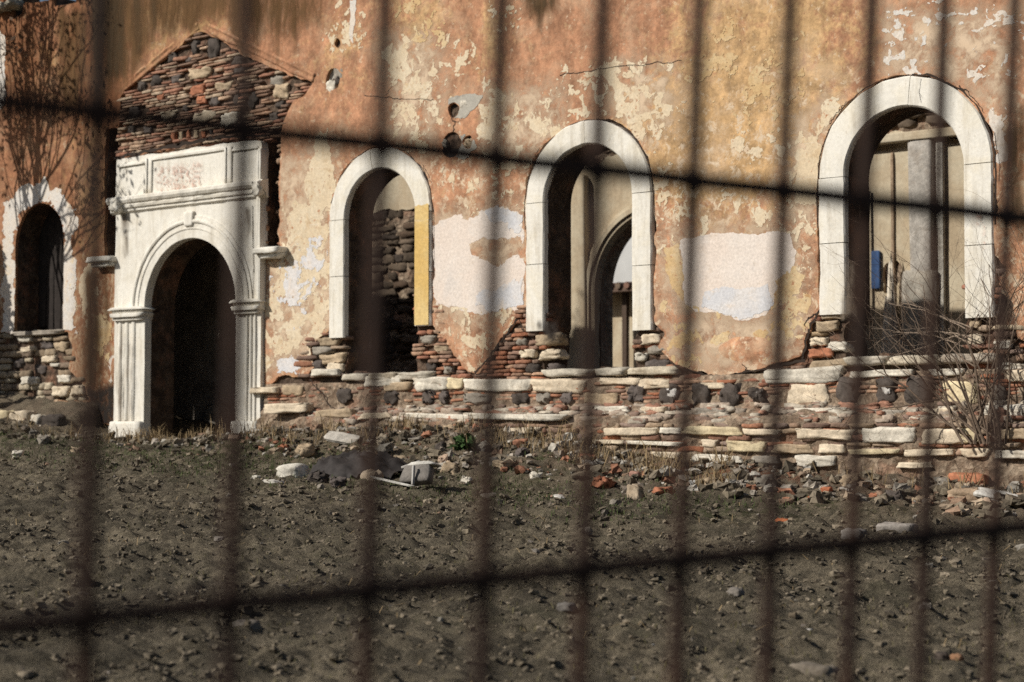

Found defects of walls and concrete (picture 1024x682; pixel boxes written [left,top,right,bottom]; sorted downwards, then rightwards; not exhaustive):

flaking render [115,128,230,156]
flaking render [117,32,235,114]
flaking render [255,62,343,121]
peeling [392,0,490,144]
peeling [507,64,592,150]
crack [560,60,681,76]
peeling [609,55,686,153]
peeling [882,0,937,76]
peeling [265,150,354,378]
peeling [411,164,486,379]
flaking render [500,189,570,379]
peeling [697,194,774,341]